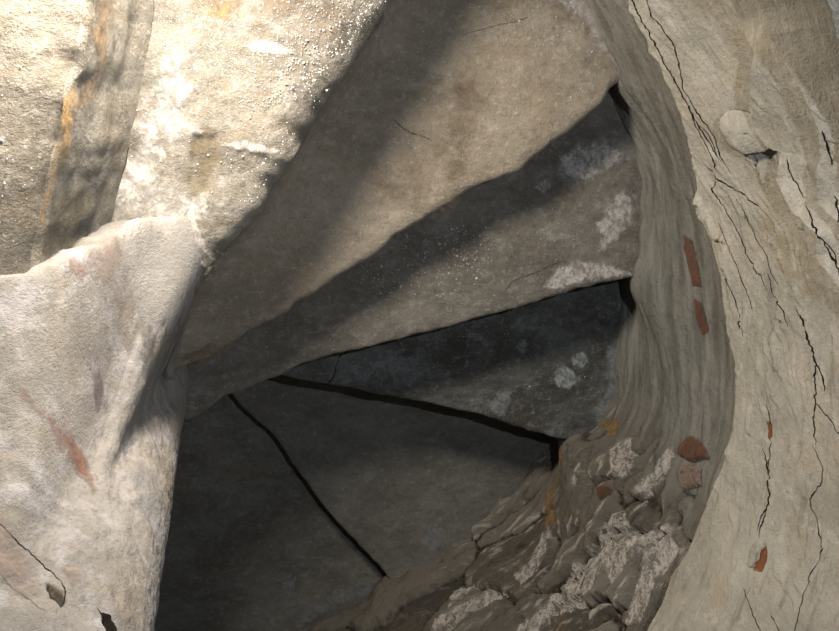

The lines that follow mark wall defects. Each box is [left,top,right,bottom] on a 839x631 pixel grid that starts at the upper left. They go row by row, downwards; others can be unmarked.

rust [55,0,109,158]
leakage [561,141,621,179]
leakage [597,194,631,247]
leakage [546,262,631,289]
crack [631,0,839,631]
crack [0,523,66,601]
flaking render [47,583,64,607]
flaking render [101,613,117,631]